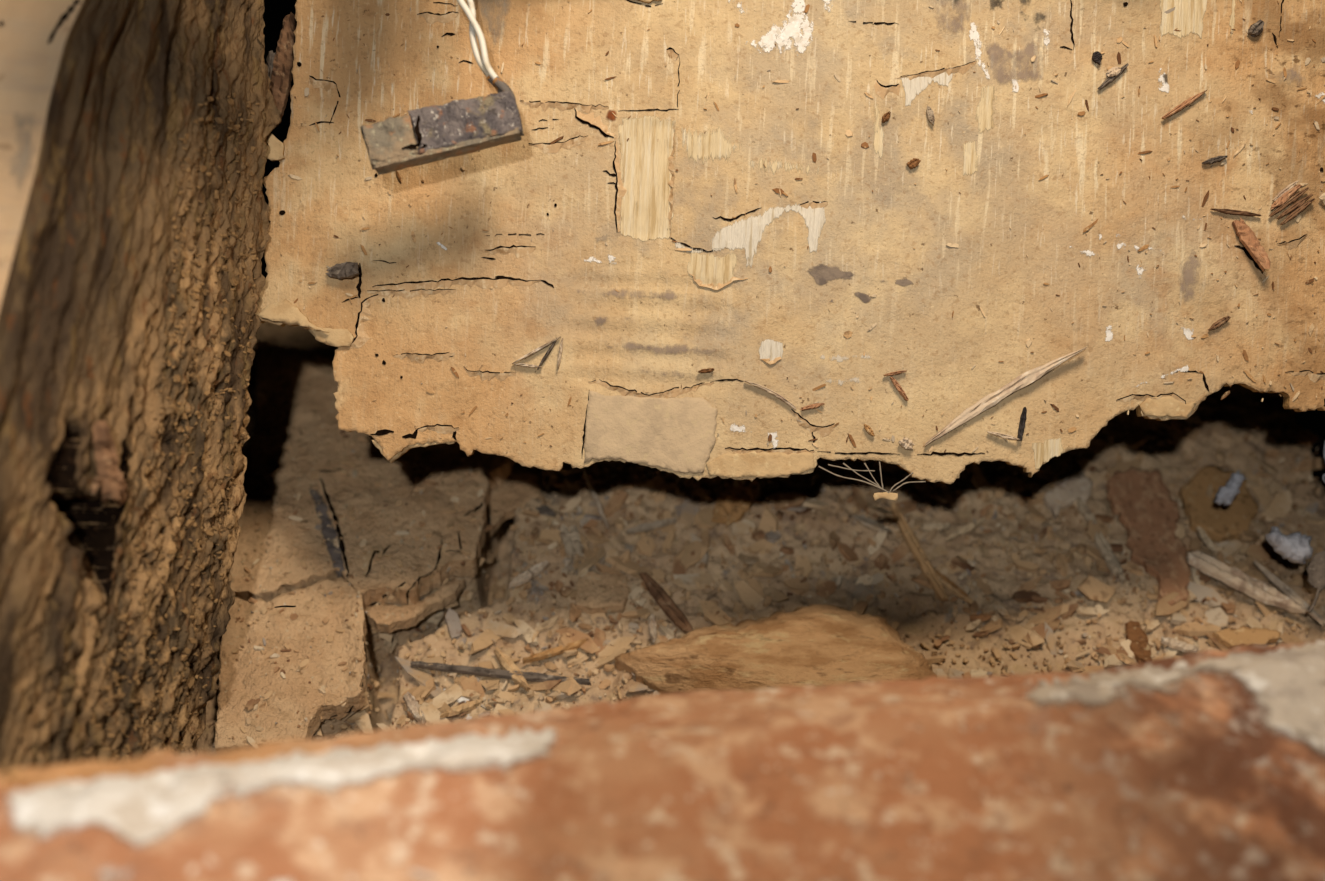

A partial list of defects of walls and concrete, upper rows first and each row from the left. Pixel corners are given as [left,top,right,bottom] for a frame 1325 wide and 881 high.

peeling [1160,0,1207,38]
crack [520,47,680,232]
peeling [618,116,826,290]
damp [1070,234,1154,277]
peeling [256,299,354,347]
crack [343,233,554,381]
peeling [759,339,783,365]
crack [582,379,742,455]
peeling [584,391,815,478]
peeling [1032,438,1065,469]
peeling [1139,396,1196,418]